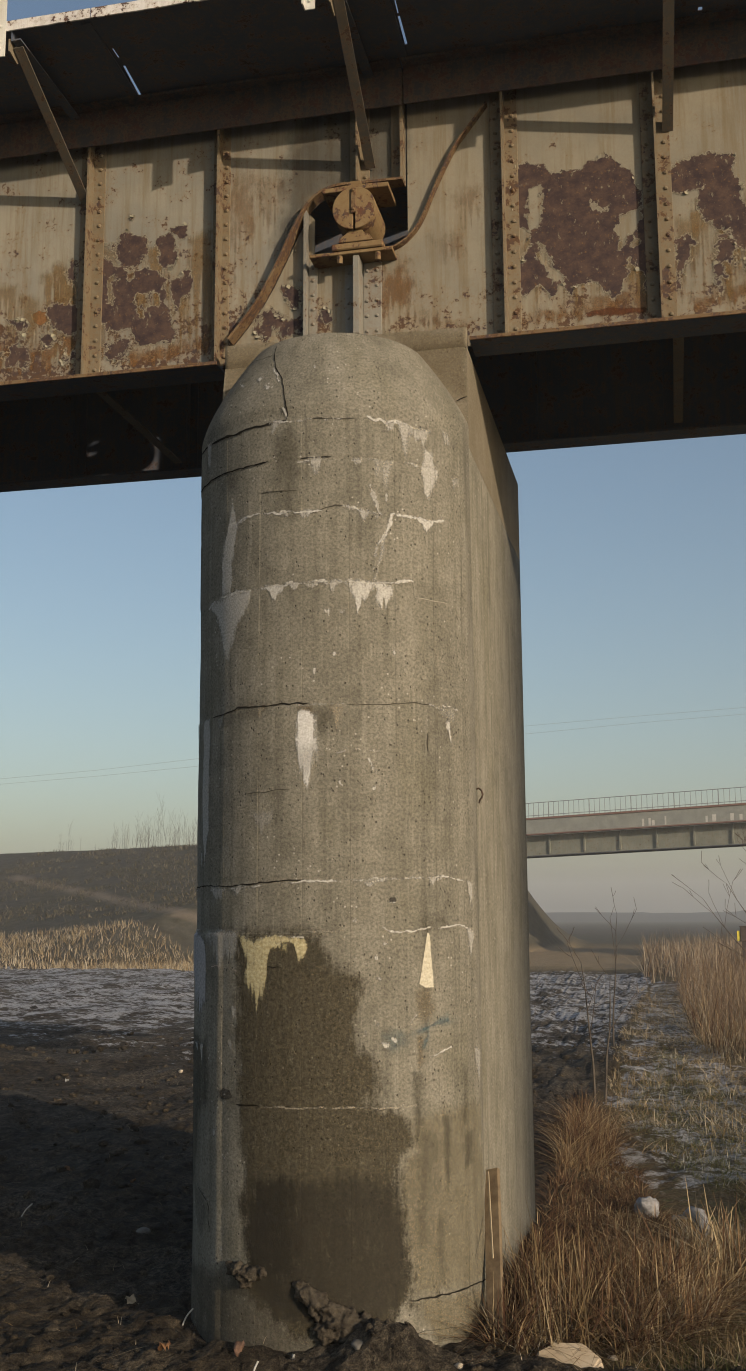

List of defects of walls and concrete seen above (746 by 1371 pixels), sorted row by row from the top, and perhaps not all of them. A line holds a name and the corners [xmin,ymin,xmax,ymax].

rust [0,266,76,376]
rust [522,267,648,325]
crack [201,347,351,514]
crack [213,702,307,718]
crack [347,702,458,711]
crack [197,879,301,888]
leakage [191,929,413,1352]